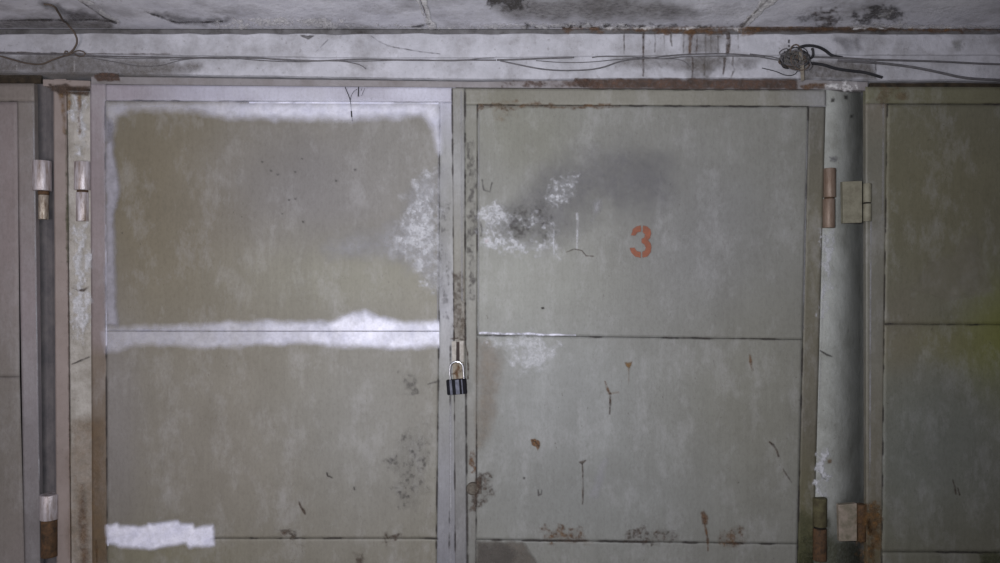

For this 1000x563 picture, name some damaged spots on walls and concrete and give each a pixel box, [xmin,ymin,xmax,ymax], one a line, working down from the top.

leakage [484,0,678,73]
leakage [687,25,733,74]
rust [565,78,858,91]